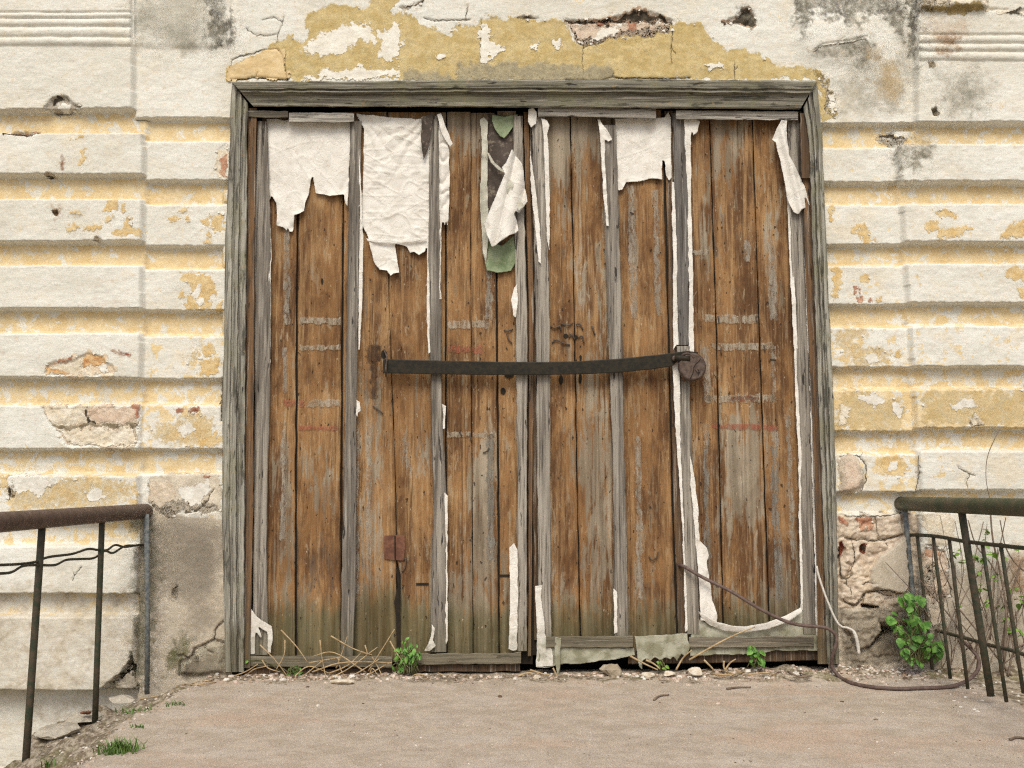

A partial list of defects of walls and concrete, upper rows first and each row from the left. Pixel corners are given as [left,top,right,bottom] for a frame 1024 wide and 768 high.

leakage [206,0,233,48]
leakage [796,0,918,69]
peeling [226,0,837,122]
flaking render [43,93,82,117]
peeling [924,208,975,244]
peeling [1000,219,1024,239]
flaking render [44,349,117,381]
flaking render [41,403,220,451]
peeling [874,454,911,479]
flaking render [0,470,223,518]
flaking render [838,516,874,554]
crack [178,621,224,675]